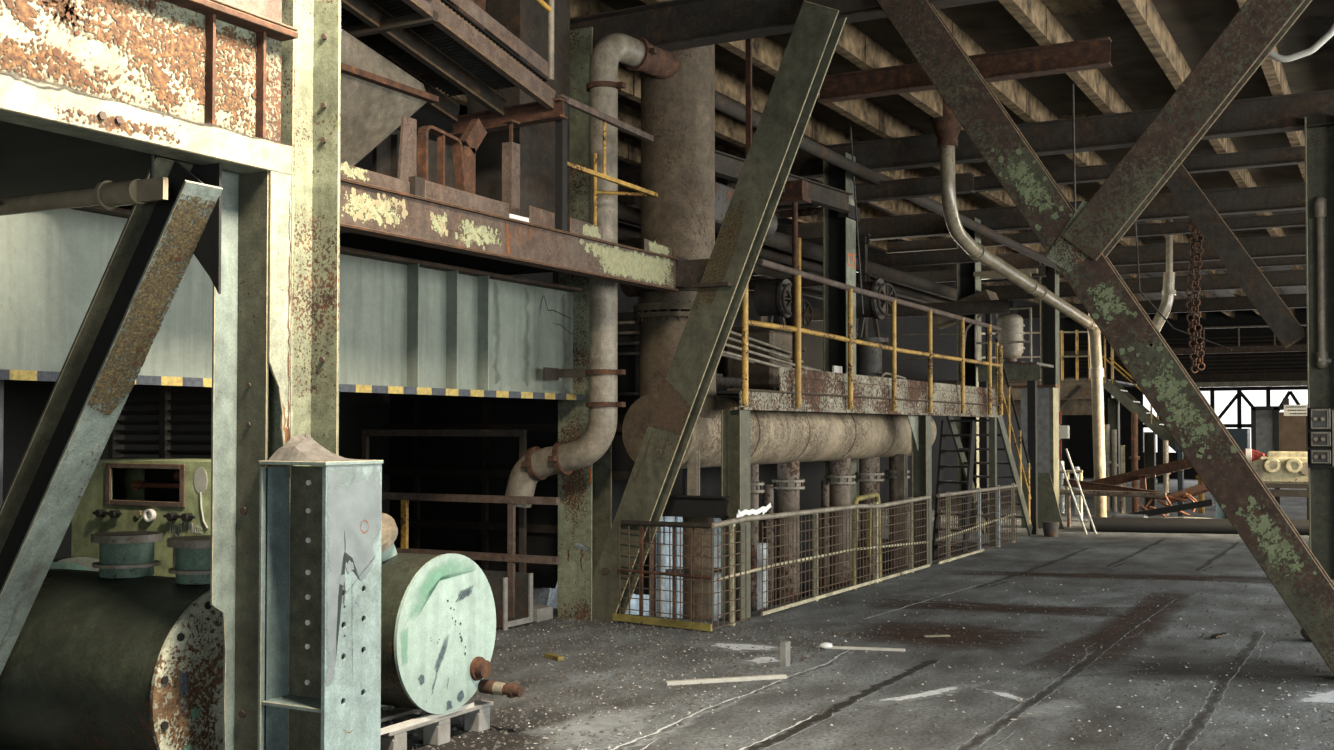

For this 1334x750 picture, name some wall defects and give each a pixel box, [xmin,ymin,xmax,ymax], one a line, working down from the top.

corrosion [0,0,273,144]
corrosion [87,193,216,416]
corrosion [283,194,291,443]
peeling [340,161,408,228]
peeling [430,210,501,250]
peeling [579,224,675,288]
crack [866,539,1164,619]
corrosion [164,608,216,750]
crack [589,650,856,750]
crack [739,660,940,750]
crack [956,599,1176,750]
crack [1155,631,1265,750]